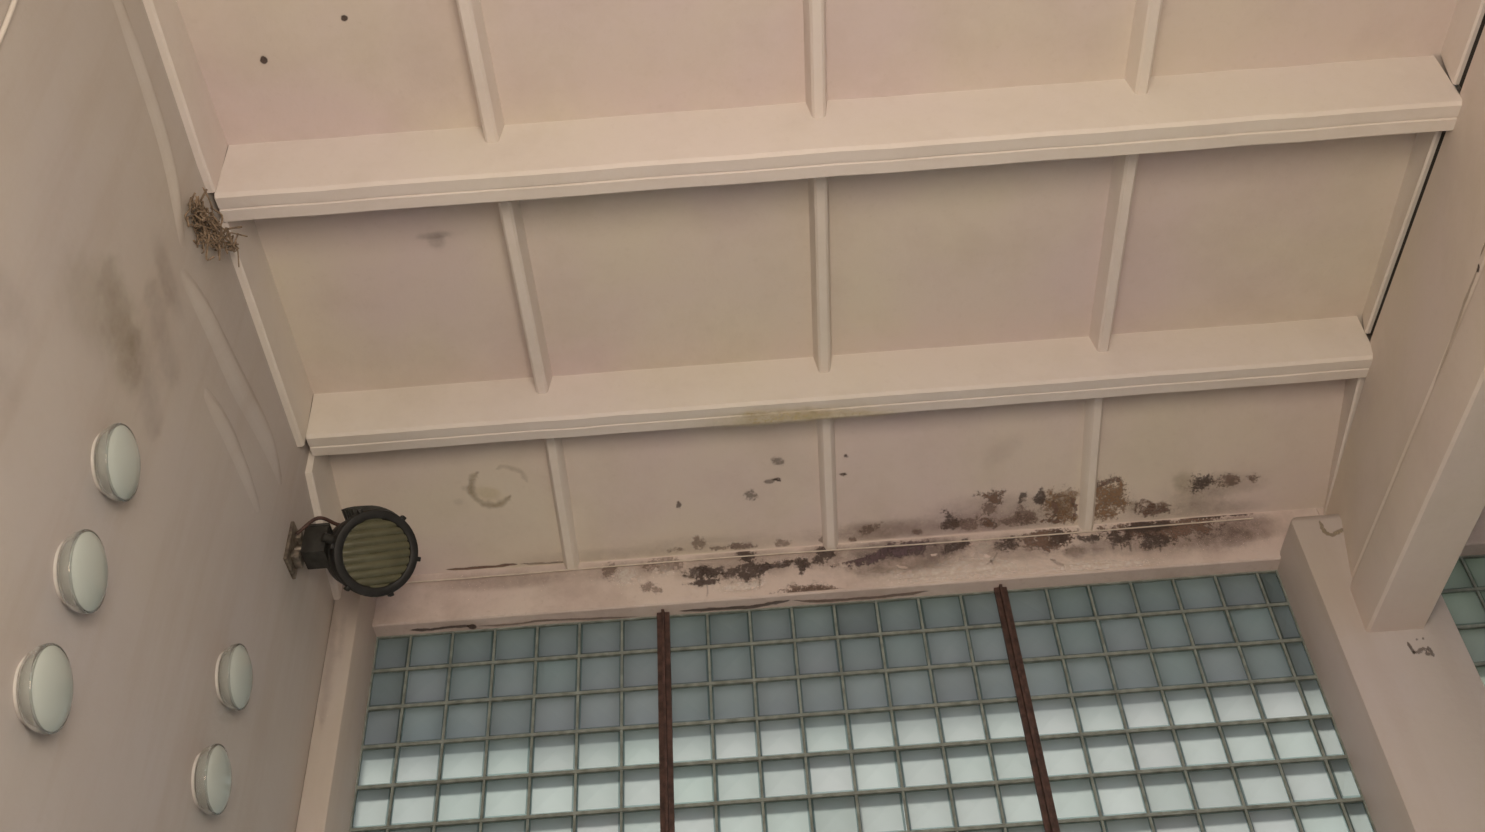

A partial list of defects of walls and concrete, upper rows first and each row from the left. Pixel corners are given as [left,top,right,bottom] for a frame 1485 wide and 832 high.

water stain [1190,473,1257,492]
water stain [683,488,1253,586]